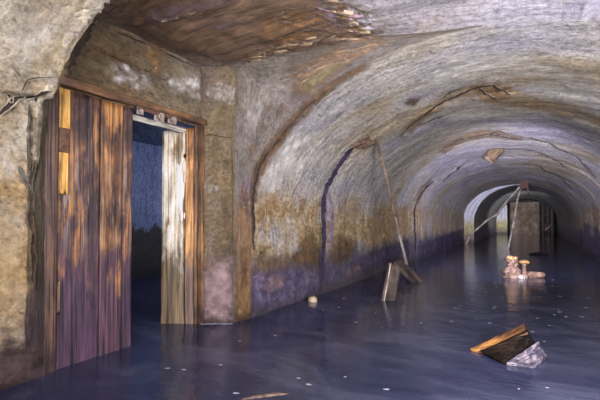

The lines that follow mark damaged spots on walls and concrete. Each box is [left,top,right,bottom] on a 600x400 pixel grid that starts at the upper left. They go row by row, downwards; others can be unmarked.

spalling [133,0,391,97]
crack [0,17,171,290]
damp [205,263,231,318]
damp [254,233,319,309]
rust [238,66,364,314]
crack [320,147,354,292]
damp [326,195,410,283]
damp [419,230,464,256]
crack [400,84,511,136]
crack [441,130,596,189]